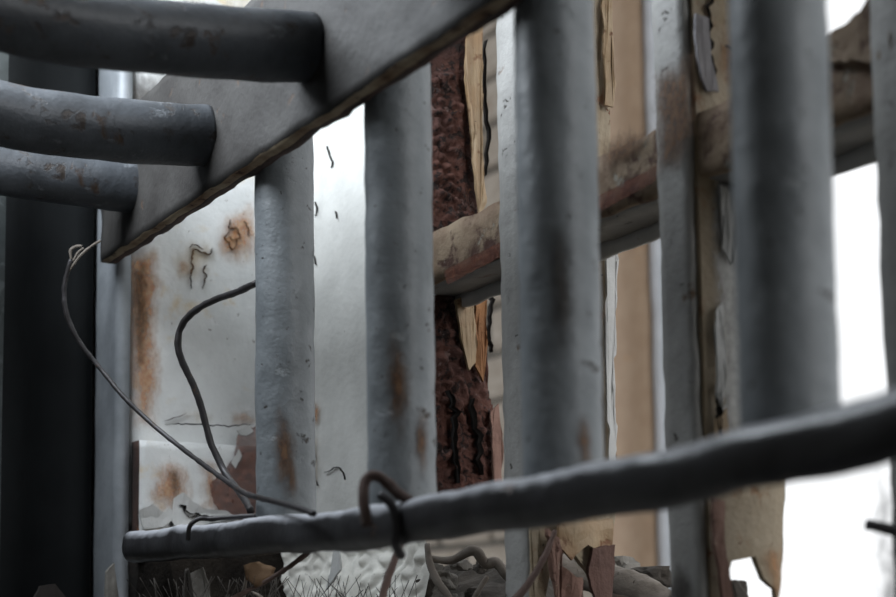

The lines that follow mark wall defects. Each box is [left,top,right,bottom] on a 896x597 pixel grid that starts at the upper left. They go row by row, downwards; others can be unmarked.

peeling [600,0,616,108]
corrosion [431,68,471,232]
crack [190,217,253,289]
corrosion [134,258,156,410]
corrosion [434,295,493,493]
peeling [604,254,619,459]
corrosion [157,469,181,498]